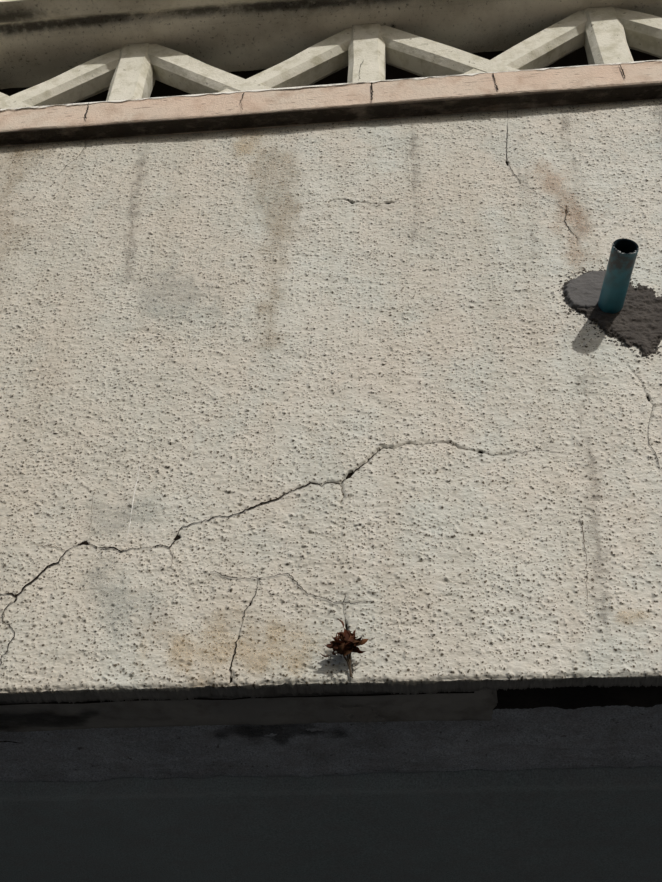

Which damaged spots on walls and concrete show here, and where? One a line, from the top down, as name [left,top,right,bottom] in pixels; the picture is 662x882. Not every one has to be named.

leakage [0,1,140,33]
leakage [175,7,225,16]
leakage [233,0,390,45]
crack [0,442,579,665]
crack [0,571,474,705]